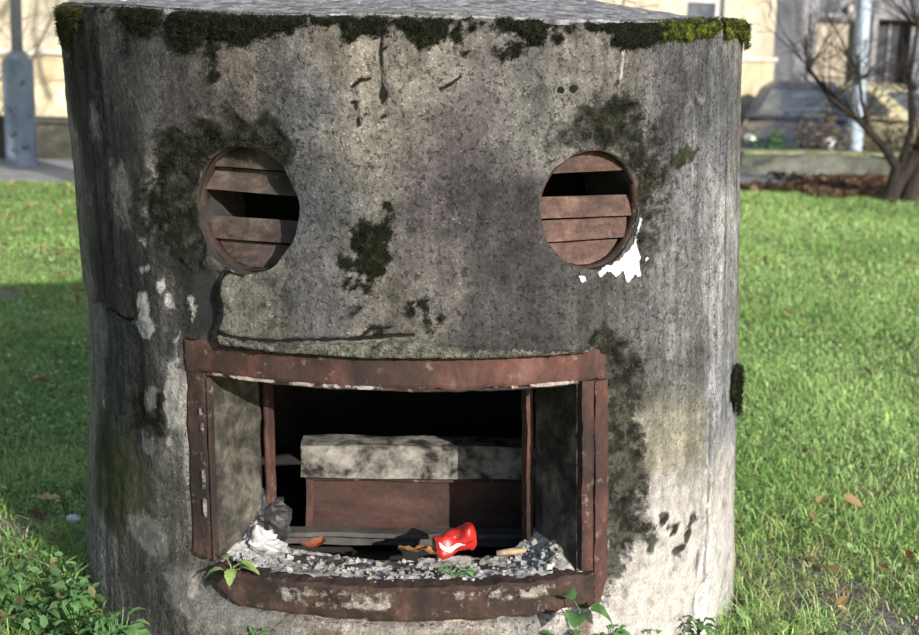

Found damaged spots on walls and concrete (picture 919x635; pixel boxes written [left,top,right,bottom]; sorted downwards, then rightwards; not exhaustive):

spalling [542,81,678,273]
leakage [136,292,155,339]
leakage [157,281,174,308]
leakage [163,248,218,330]
leakage [579,399,735,635]